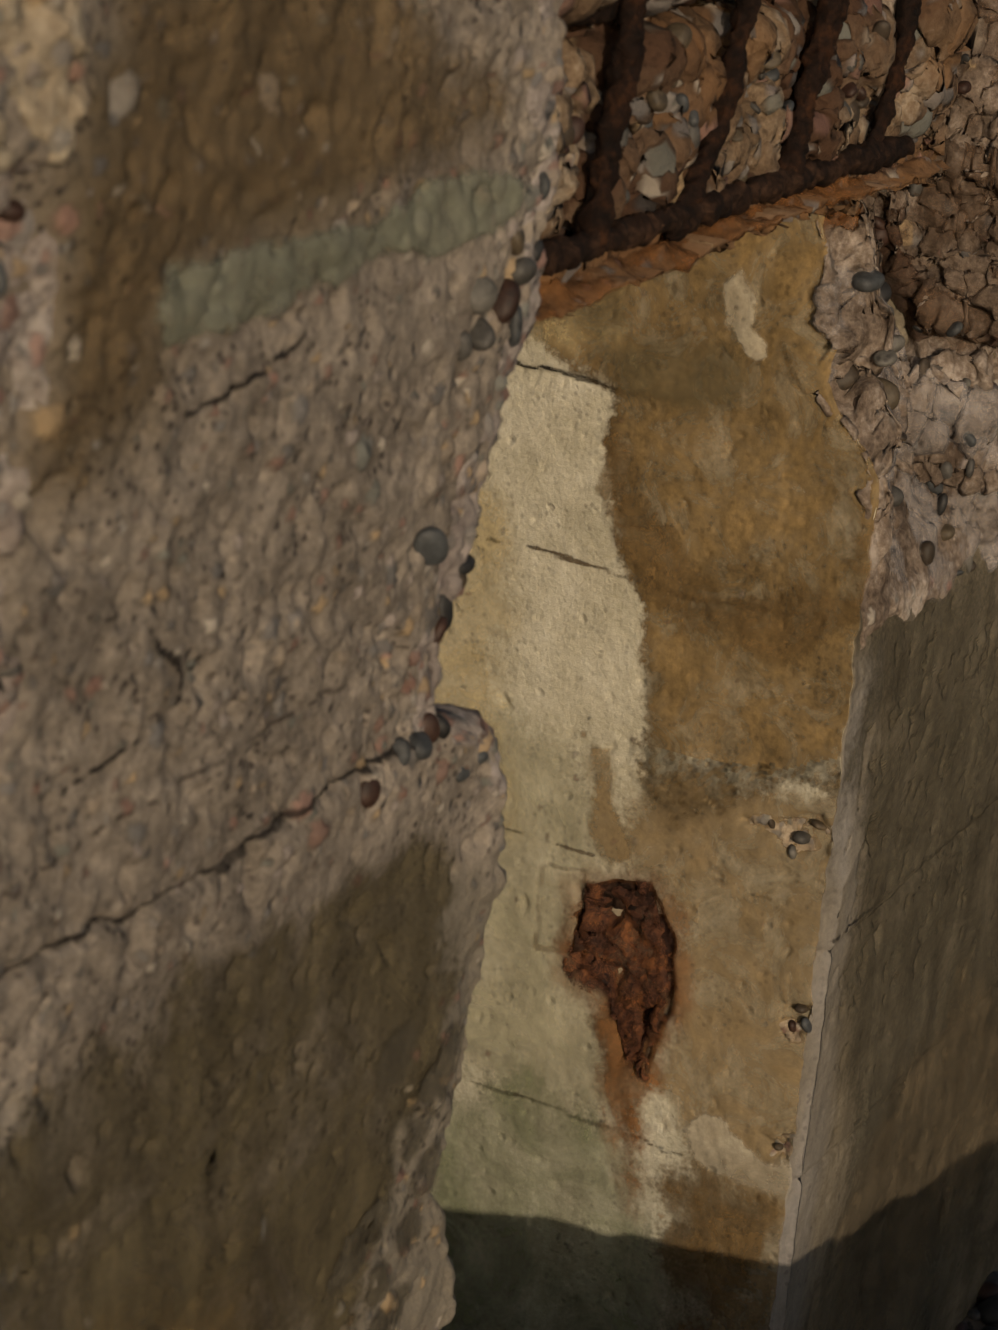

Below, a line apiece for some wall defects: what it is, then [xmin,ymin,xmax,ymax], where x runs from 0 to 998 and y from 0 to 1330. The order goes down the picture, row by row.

damp [33,0,508,494]
spalling [391,0,670,797]
spalling [611,0,818,220]
spalling [711,0,998,650]
crack [0,746,416,976]
damp [0,834,462,1330]
spalling [360,779,381,809]
rust [595,981,673,1187]
damp [534,213,998,1330]